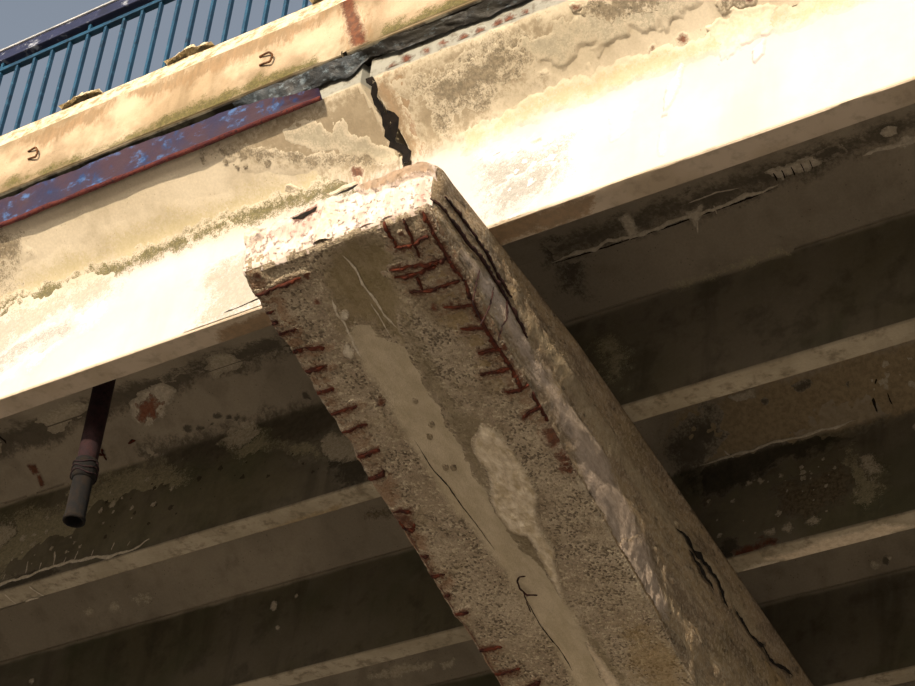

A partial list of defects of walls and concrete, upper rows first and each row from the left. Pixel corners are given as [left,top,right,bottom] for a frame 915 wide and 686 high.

corrosion [333,0,377,53]
leakage [392,0,704,160]
leakage [0,85,401,357]
crack [552,185,778,264]
crack [0,539,149,590]
leakage [106,244,296,426]
spalling [245,265,547,686]
leakage [307,196,693,686]
spalling [380,118,764,643]
crack [676,528,793,676]
spalling [663,339,915,463]
spalling [720,521,915,572]